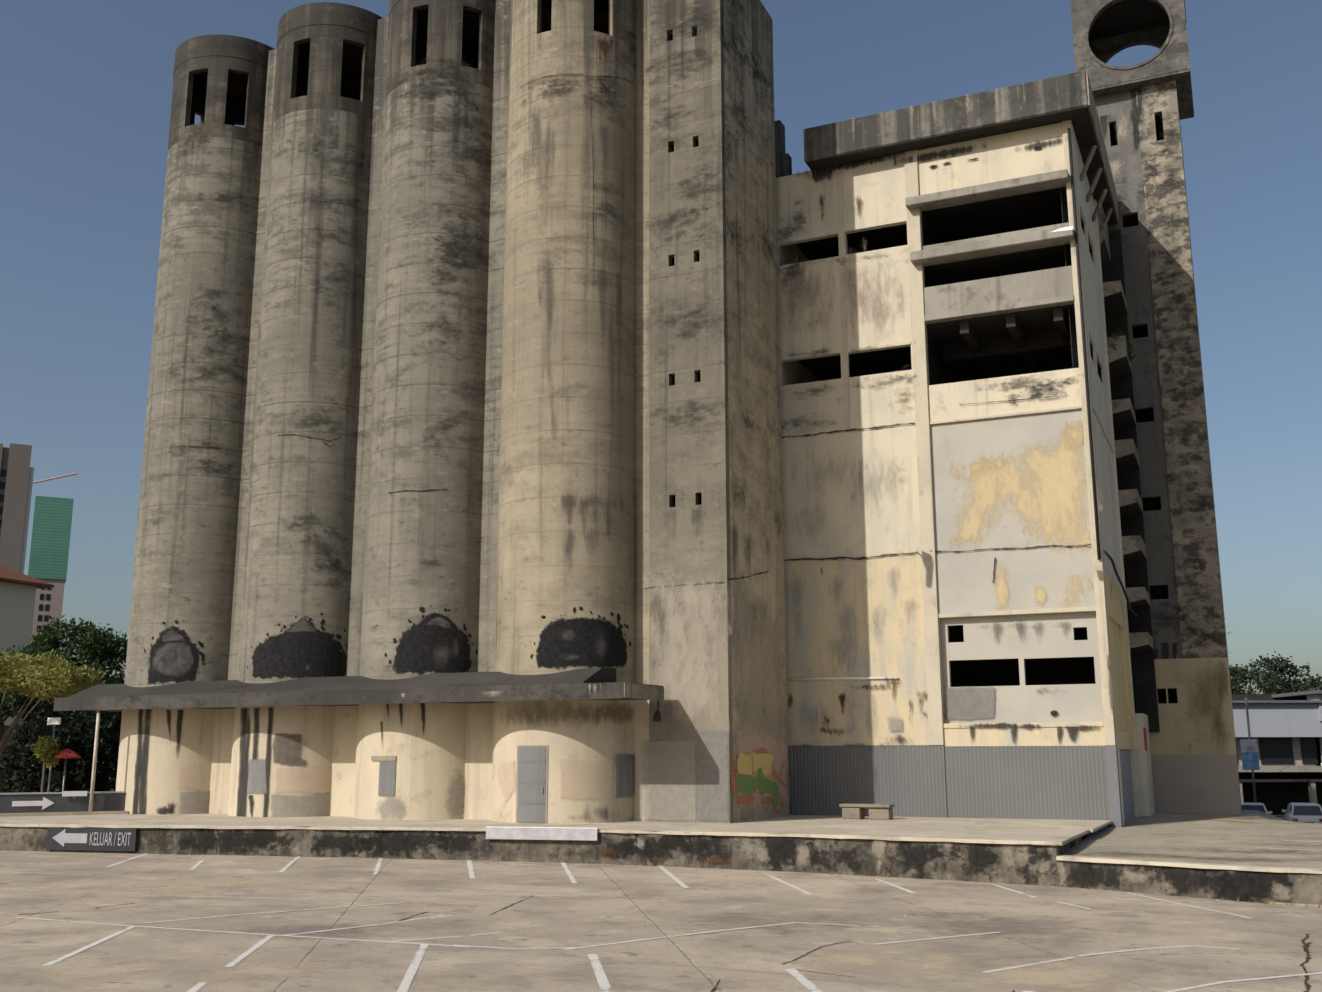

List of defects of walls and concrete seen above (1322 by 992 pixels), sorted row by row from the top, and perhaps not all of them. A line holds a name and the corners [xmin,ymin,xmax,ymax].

peeling [951,423,1090,549]
leakage [132,709,183,814]
leakage [178,708,293,855]
leakage [311,830,477,857]
leakage [600,834,735,866]
leakage [759,836,863,872]
leakage [885,841,999,879]
leakage [1015,845,1293,902]